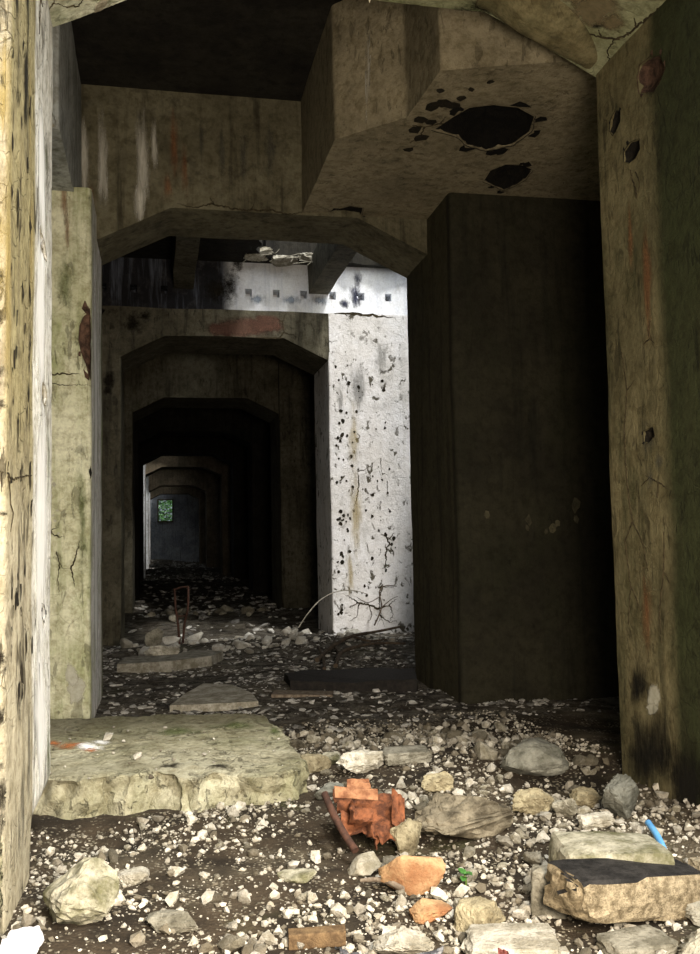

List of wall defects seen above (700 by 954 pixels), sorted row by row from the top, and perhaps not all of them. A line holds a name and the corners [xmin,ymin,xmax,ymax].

crack [39,0,83,34]
spalling [609,108,621,135]
spalling [403,87,547,194]
spalling [623,139,640,164]
crack [52,372,90,386]
crack [0,461,32,532]
crack [347,533,397,624]